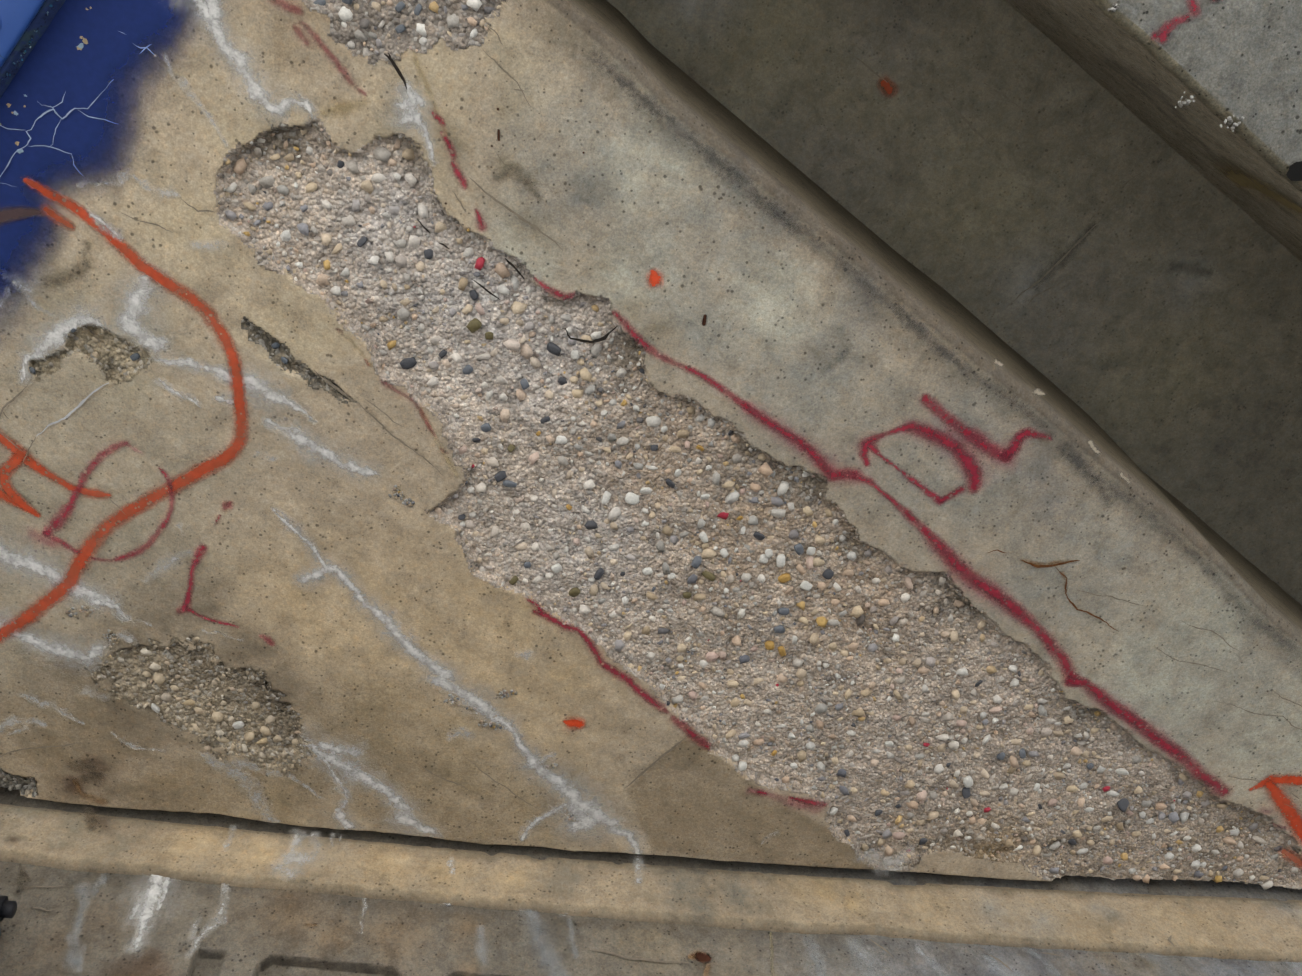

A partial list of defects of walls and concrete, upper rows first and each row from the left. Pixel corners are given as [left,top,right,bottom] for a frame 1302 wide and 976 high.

spalling [302,0,506,65]
crack [0,79,116,187]
spalling [29,324,152,385]
spalling [214,115,1302,890]
crack [988,550,1148,631]
spalling [84,629,317,776]
crack [1153,621,1302,730]
spalling [0,768,37,797]